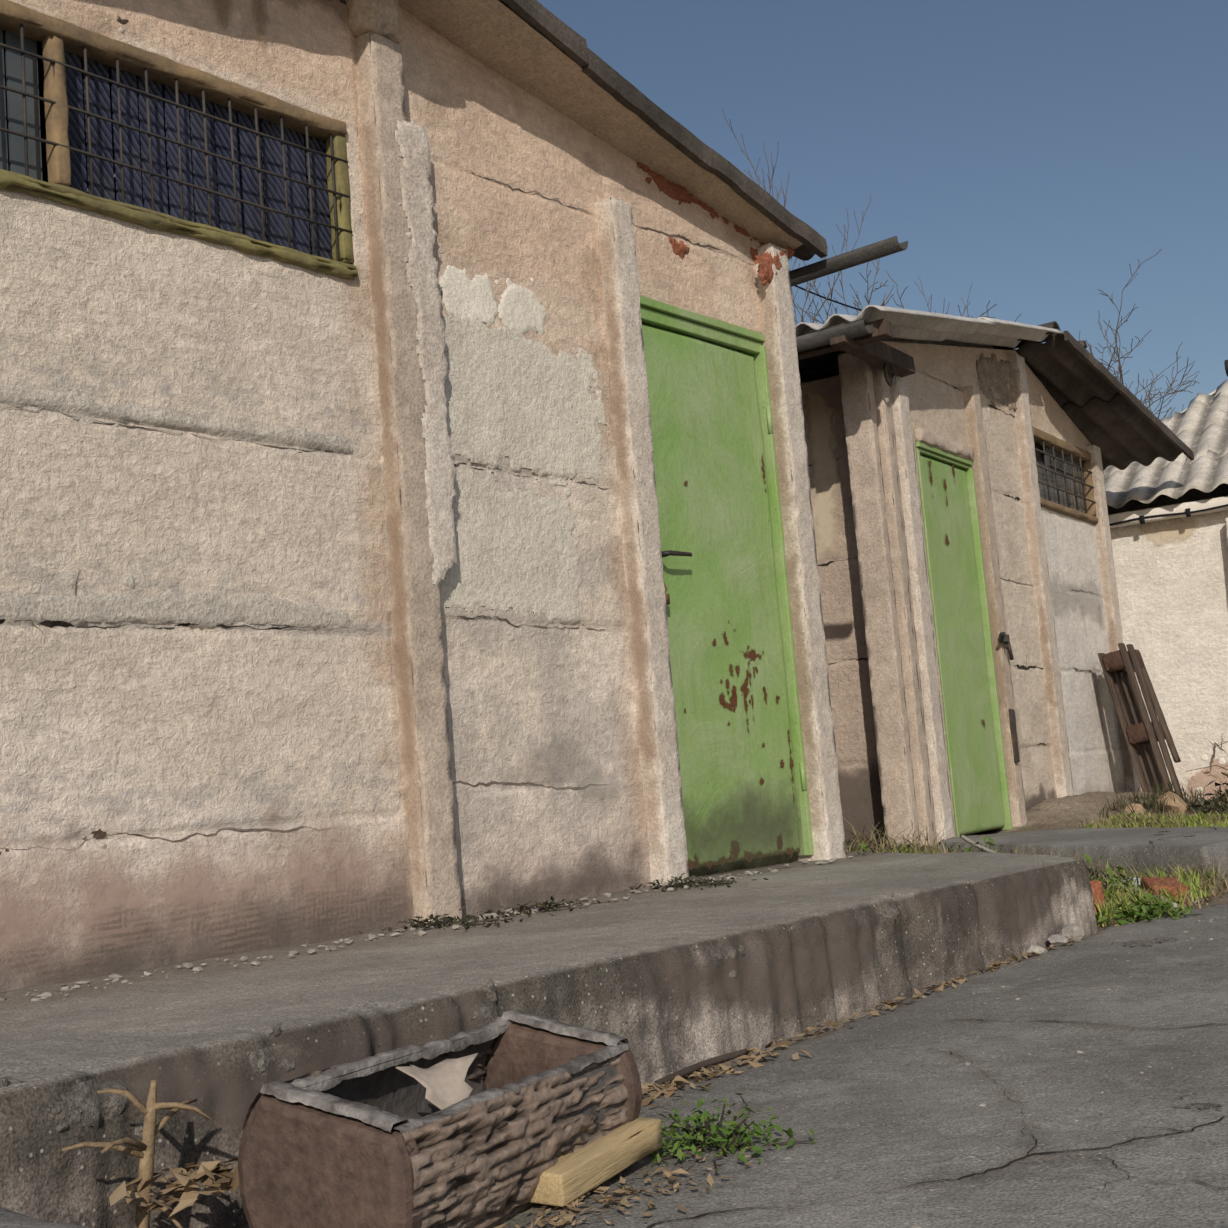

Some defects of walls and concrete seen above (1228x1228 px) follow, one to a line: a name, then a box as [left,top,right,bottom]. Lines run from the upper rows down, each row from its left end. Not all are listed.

flaking render [636,162,795,286]
flaking render [395,120,610,625]
crack [0,570,311,630]
corrosion [719,645,780,733]
corrosion [780,730,795,801]
crack [2,813,330,853]
corrosion [688,834,800,870]